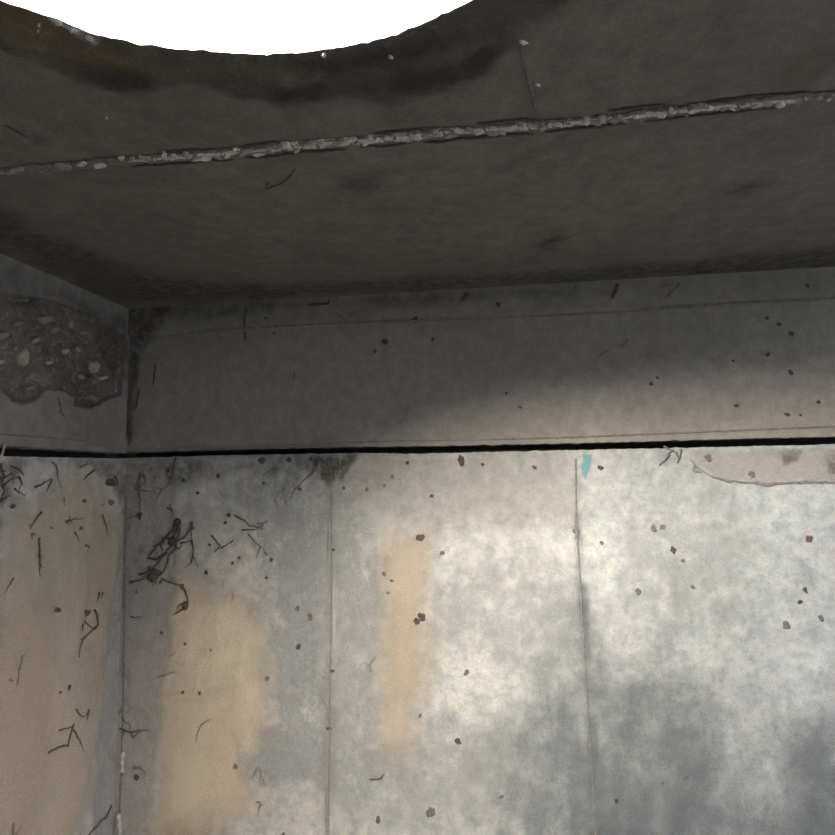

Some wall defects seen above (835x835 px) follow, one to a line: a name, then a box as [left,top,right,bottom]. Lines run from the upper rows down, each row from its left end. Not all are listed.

water stain [0,0,565,103]
crack [132,91,811,190]
spalling [0,292,138,409]
crack [483,425,835,440]
crack [690,458,835,487]
water stain [94,468,176,835]
water stain [245,482,379,834]
crack [322,469,332,835]
crack [575,459,597,835]